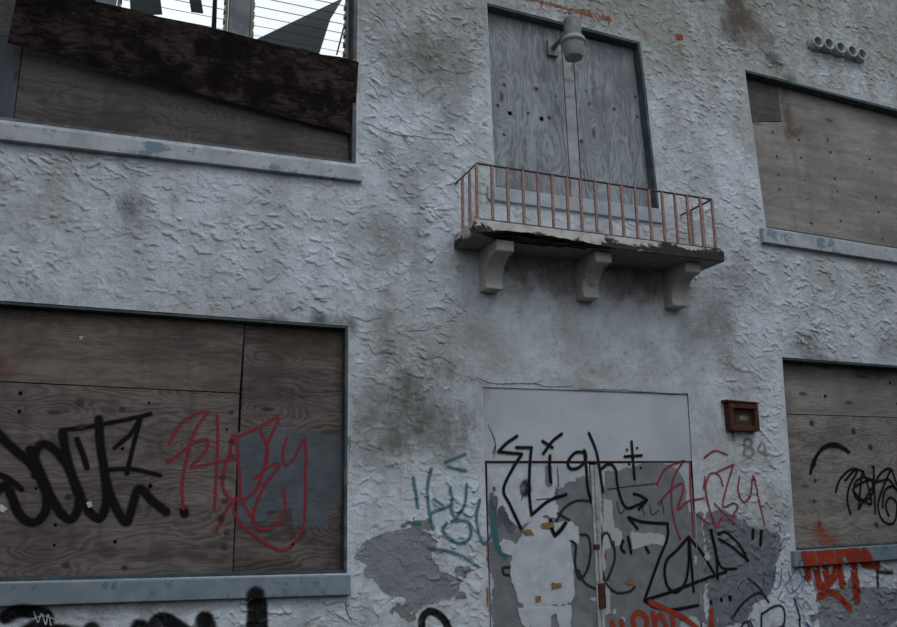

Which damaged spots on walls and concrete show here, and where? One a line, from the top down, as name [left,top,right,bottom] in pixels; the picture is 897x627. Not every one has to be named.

rust [527,0,611,24]
peeling [355,516,471,622]
peeling [810,577,897,627]